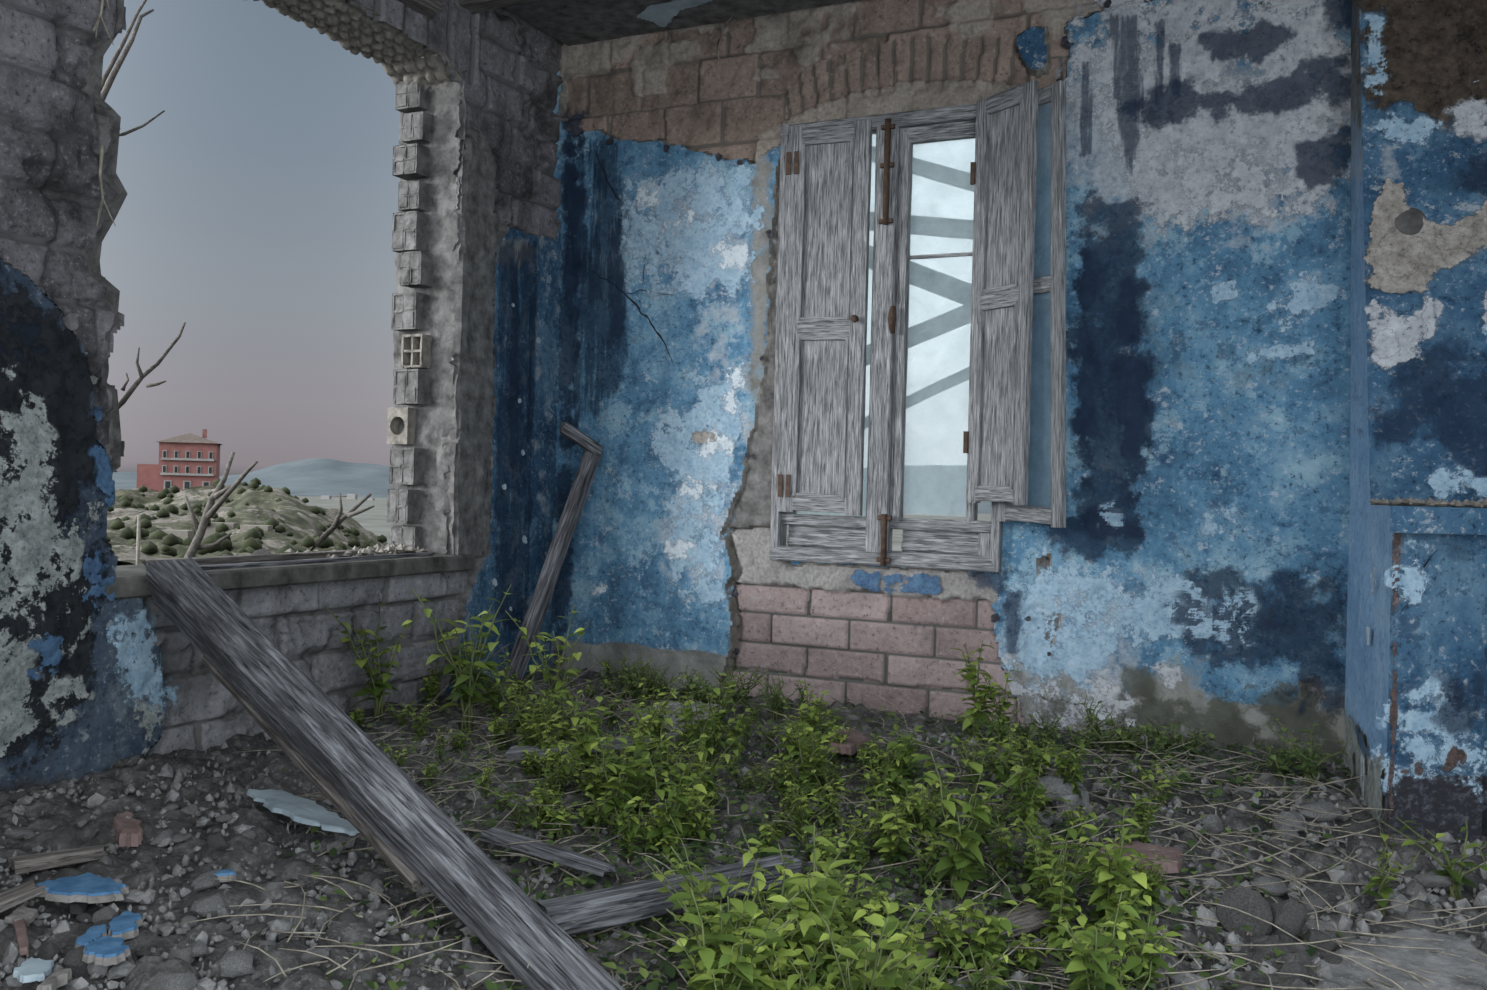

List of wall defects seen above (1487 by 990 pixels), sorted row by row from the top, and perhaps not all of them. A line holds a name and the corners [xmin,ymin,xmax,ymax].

spalling [558,0,1352,729]
spalling [1362,178,1487,369]
water stain [968,190,1347,739]
peeling [27,632,64,680]
peeling [82,549,119,613]